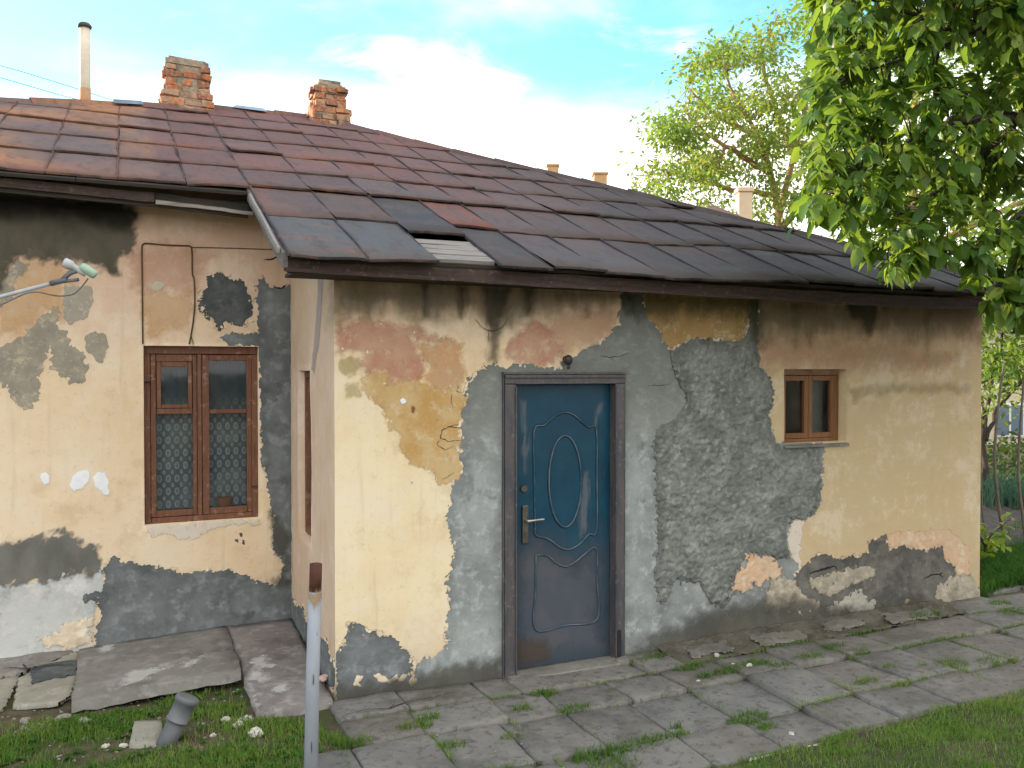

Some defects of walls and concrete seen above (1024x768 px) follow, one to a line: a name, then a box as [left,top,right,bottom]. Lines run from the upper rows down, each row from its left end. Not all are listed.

leakage [0,194,137,290]
leakage [342,285,471,313]
leakage [484,289,575,358]
flaking render [0,259,307,658]
crack [437,385,459,479]
flaking render [313,293,980,701]